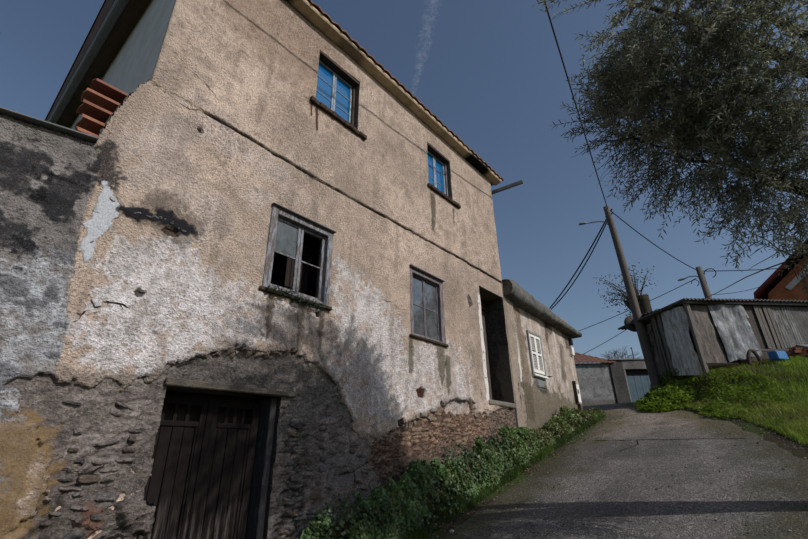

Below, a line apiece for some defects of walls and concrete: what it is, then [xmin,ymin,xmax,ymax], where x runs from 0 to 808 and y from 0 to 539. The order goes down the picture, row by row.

damp [0,210,40,269]
damp [0,138,128,222]
crack [222,123,496,280]
damp [0,411,65,539]
spalling [3,293,524,539]
damp [437,348,451,393]